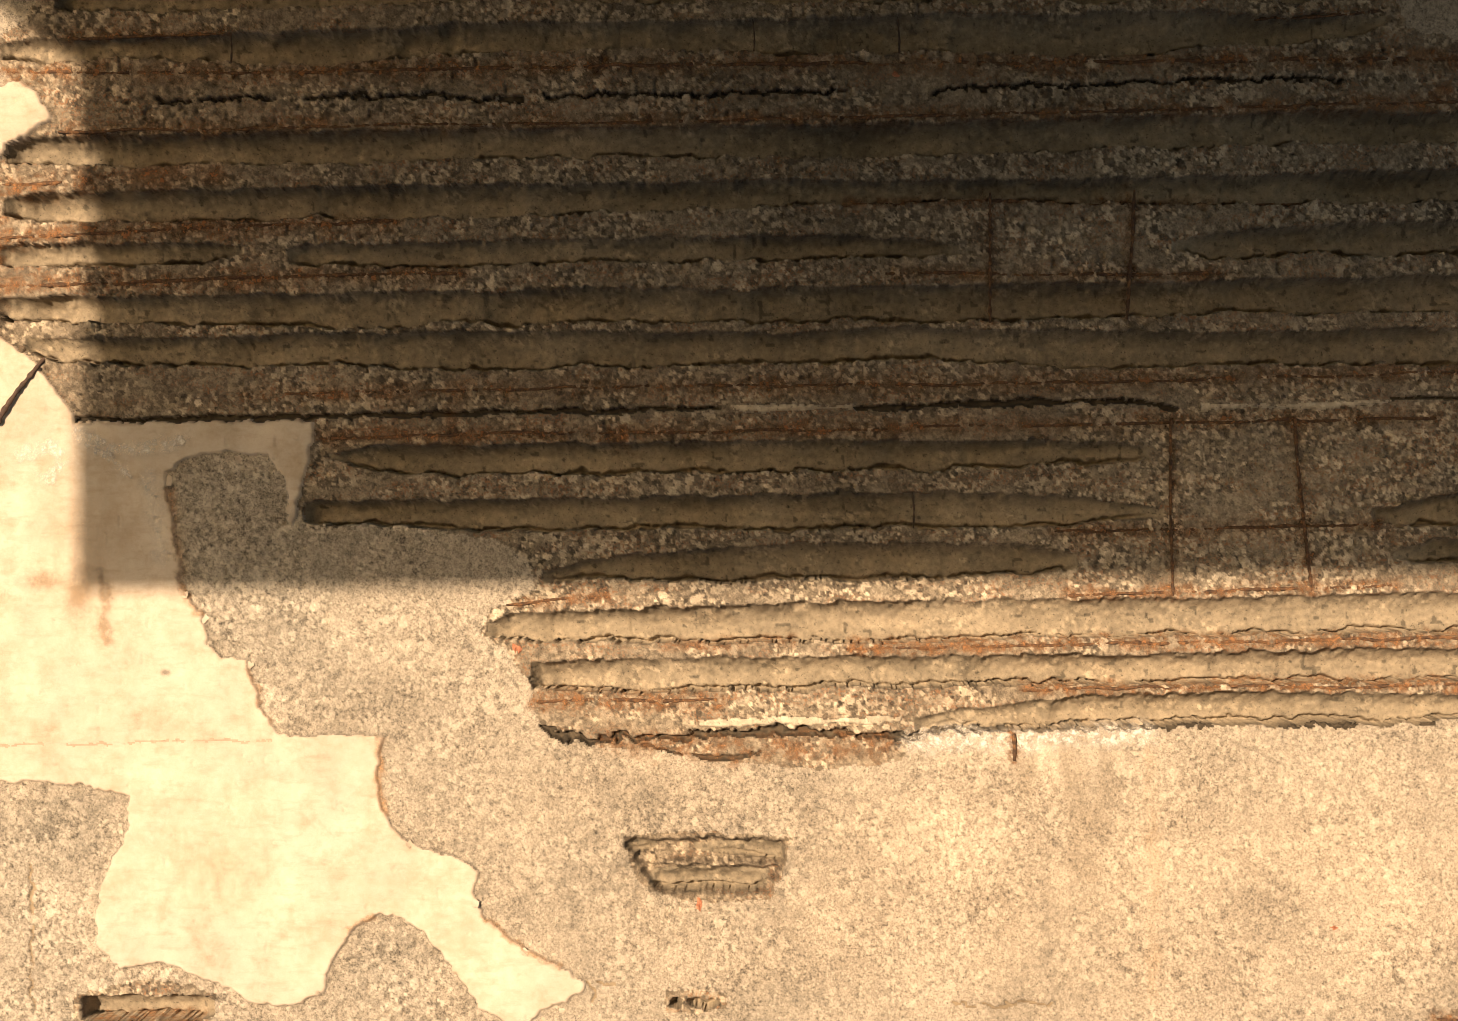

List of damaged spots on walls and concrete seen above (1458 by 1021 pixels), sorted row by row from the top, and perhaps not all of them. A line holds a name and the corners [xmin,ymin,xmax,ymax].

corrosion [2,57,608,84]
spalling [0,0,1458,424]
corrosion [0,215,465,301]
corrosion [295,370,1185,453]
spalling [166,399,1458,1021]
corrosion [848,628,1458,657]
corrosion [1165,675,1458,694]
peeling [0,780,503,1021]